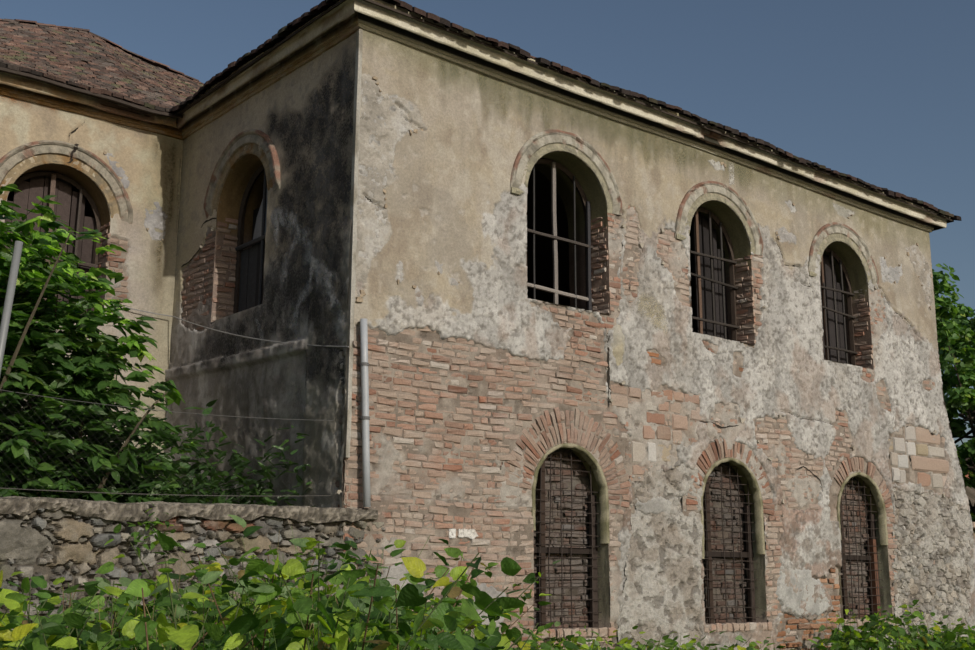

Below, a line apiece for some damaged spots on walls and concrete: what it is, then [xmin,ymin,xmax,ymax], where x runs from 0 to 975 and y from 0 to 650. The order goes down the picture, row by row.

flaking render [104,235,130,301]
flaking render [181,227,216,332]
leakage [198,56,355,390]
flaking render [355,74,427,302]
flaking render [861,243,933,413]
flaking render [335,204,855,650]
flaking render [888,424,949,497]
flaking render [884,512,900,619]